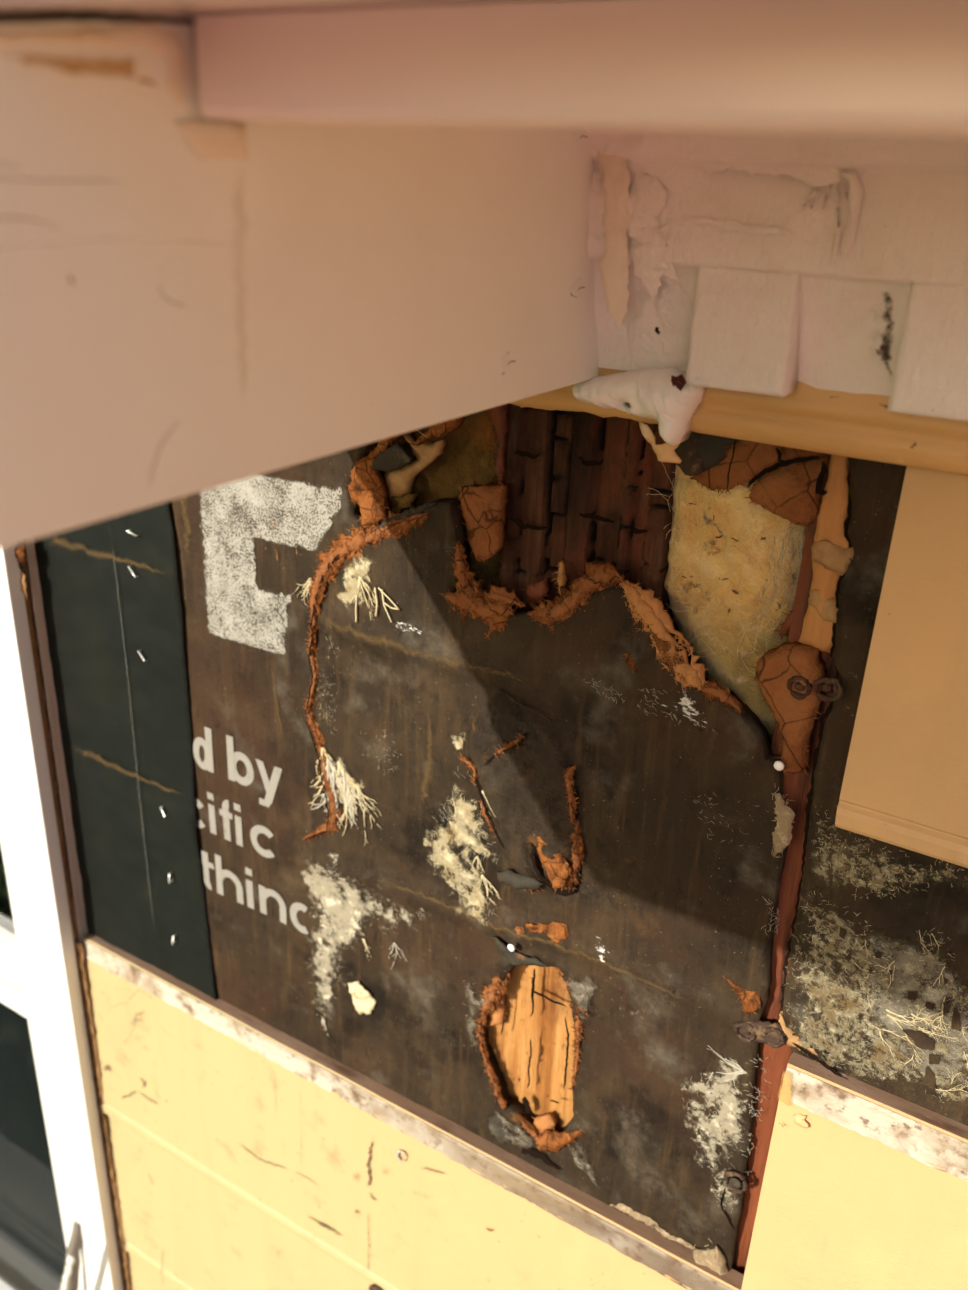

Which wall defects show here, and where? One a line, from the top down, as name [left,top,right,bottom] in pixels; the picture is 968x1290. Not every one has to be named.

peeling [345,416,466,530]
peeling [457,403,510,563]
peeling [639,421,685,464]
peeling [690,440,830,526]
leakage [308,636,381,846]
leakage [301,736,560,1039]
peeling [487,994,507,1027]
mould [785,810,968,1101]
peeling [531,1112,557,1134]
leakage [682,1045,750,1212]